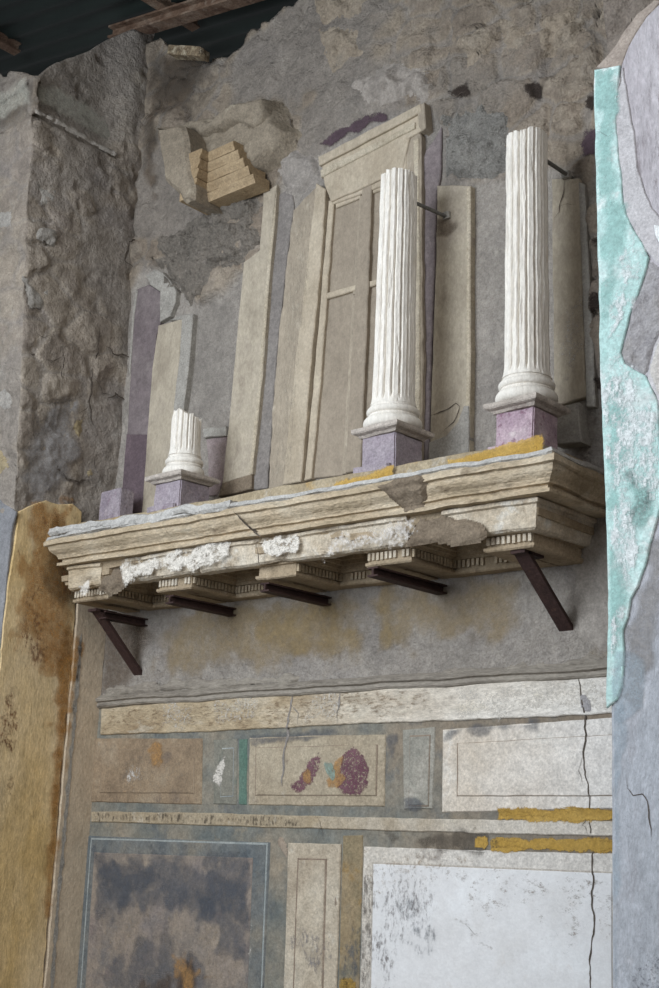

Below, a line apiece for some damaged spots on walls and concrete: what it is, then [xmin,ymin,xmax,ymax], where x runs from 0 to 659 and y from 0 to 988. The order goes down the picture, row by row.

peeling [120,542,231,586]
peeling [260,534,299,556]
damp [52,631,72,814]
crack [281,696,299,784]
crack [578,679,595,988]
crack [627,788,652,841]